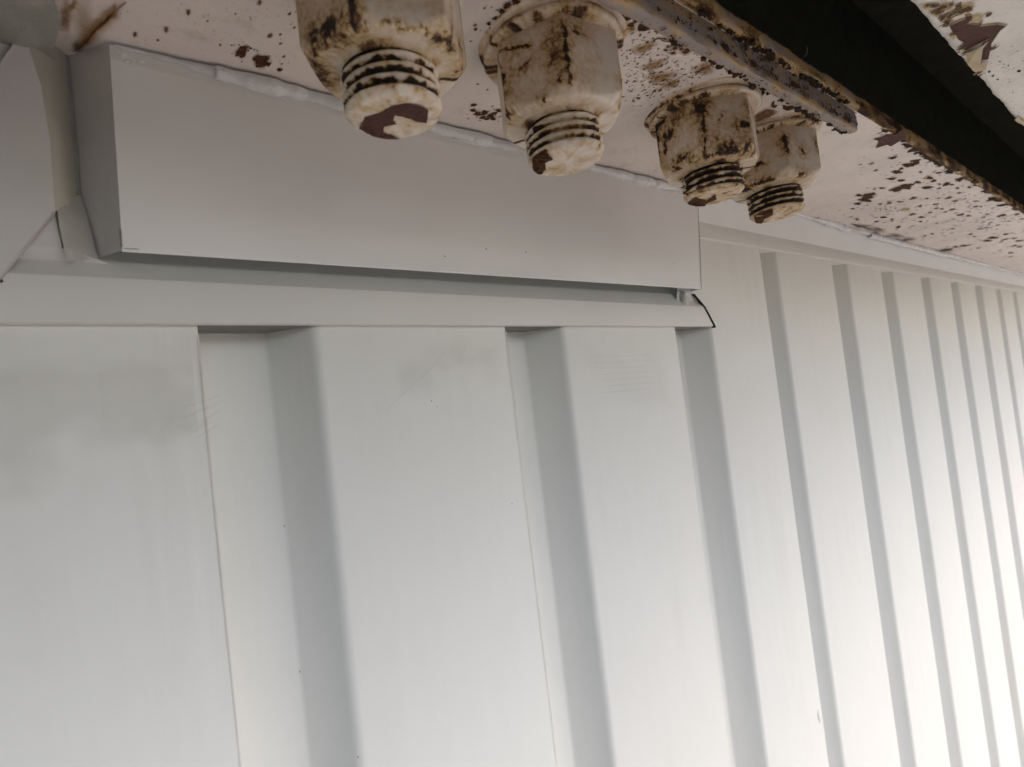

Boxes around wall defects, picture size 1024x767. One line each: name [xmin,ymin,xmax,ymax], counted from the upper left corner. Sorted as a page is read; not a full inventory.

corrosion [470,0,521,42]
corrosion [621,0,858,135]
peeling [923,2,1008,77]
corrosion [466,104,502,122]